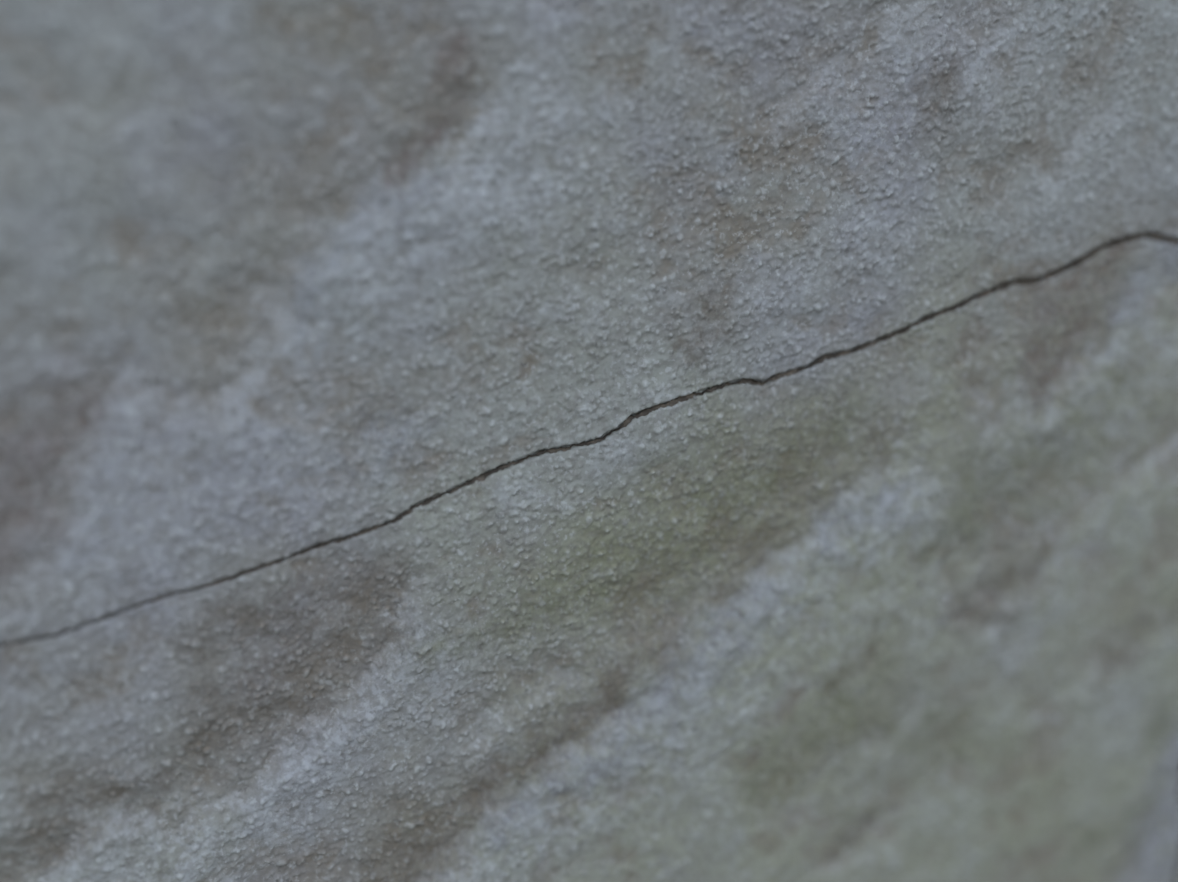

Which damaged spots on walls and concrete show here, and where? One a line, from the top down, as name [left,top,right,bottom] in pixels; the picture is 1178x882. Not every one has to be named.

crack [0,232,1178,647]